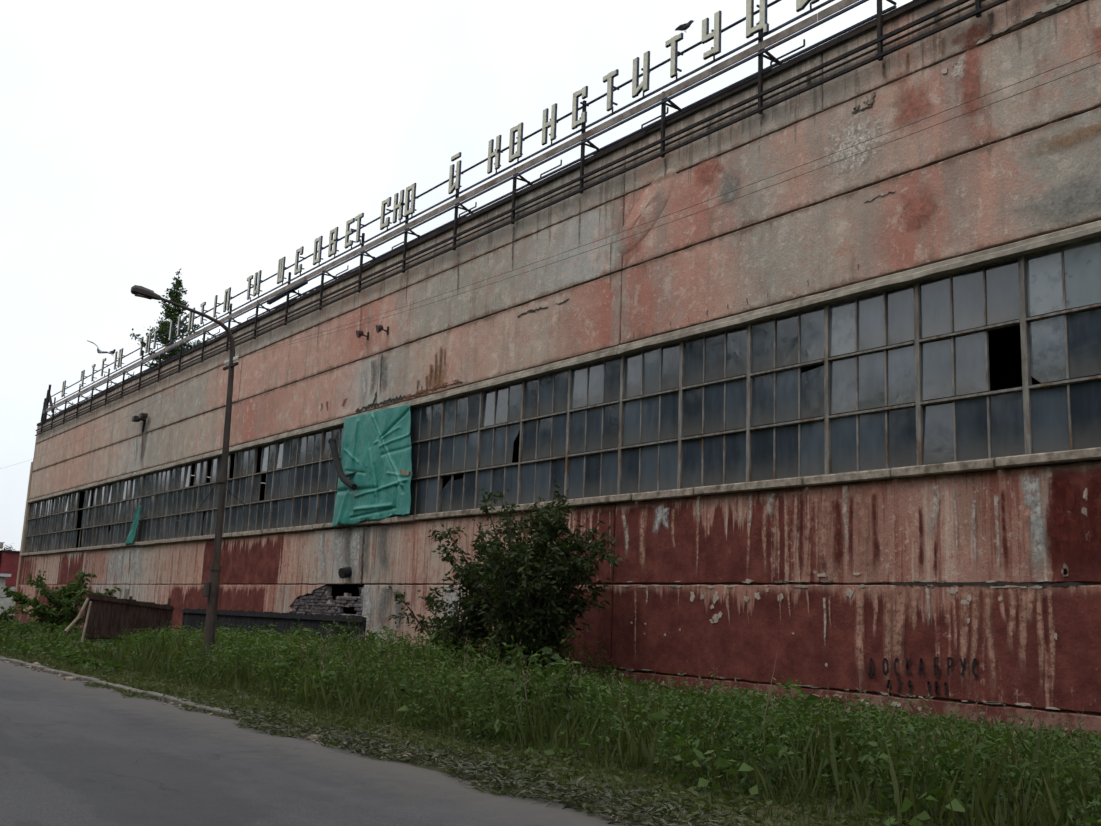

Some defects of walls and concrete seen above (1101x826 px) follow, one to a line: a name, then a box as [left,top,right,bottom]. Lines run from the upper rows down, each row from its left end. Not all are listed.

rust [385,347,460,405]
damp [623,506,675,565]
damp [734,485,879,568]
damp [919,485,958,569]
damp [994,491,1007,565]
damp [1022,475,1101,564]
flaking render [291,587,363,616]
peeling [623,579,808,623]
damp [856,586,930,671]
spalling [892,563,1083,624]
damp [952,586,1055,687]